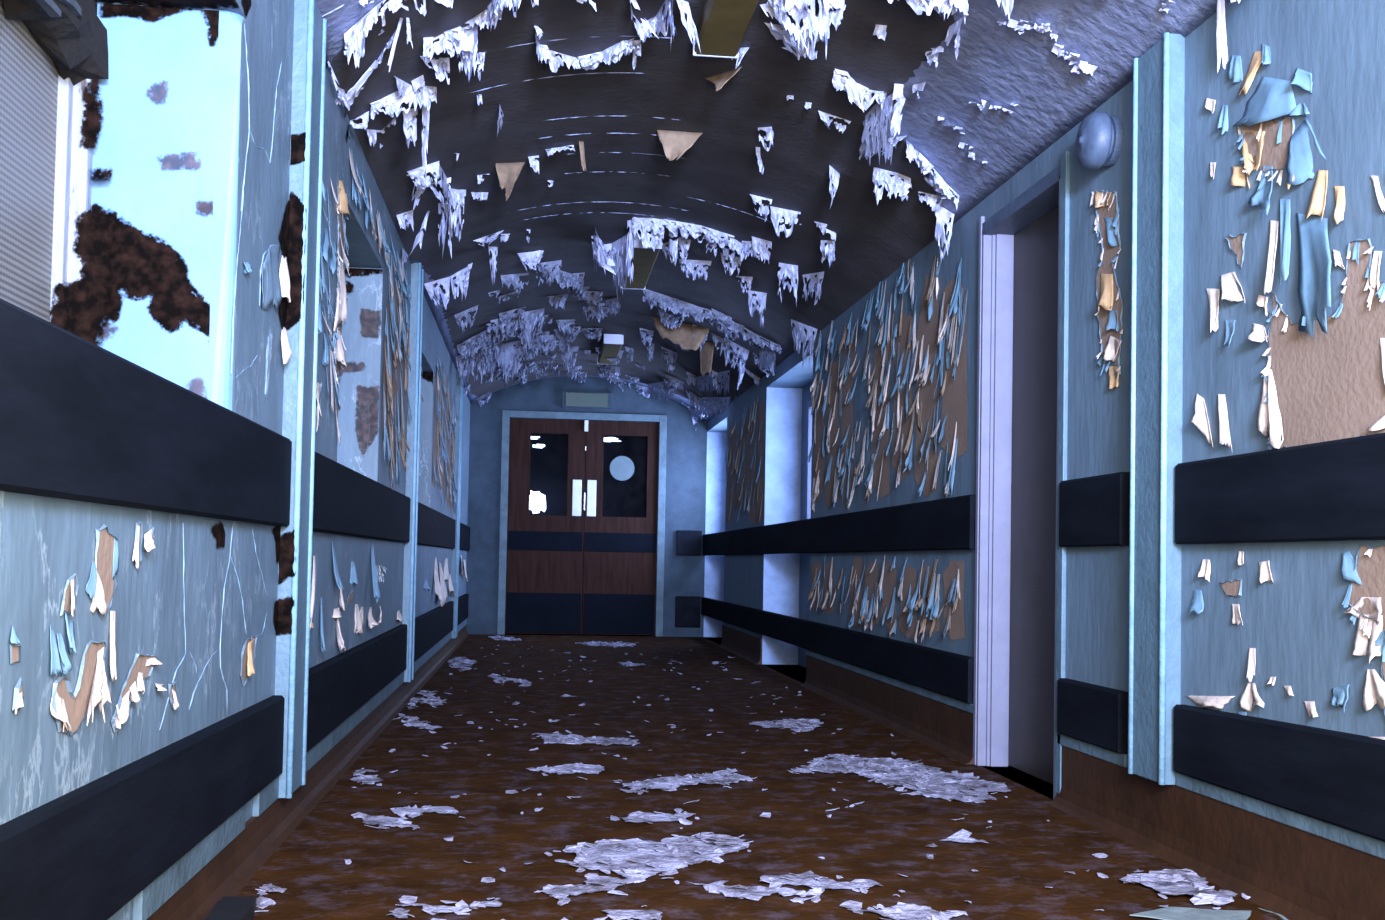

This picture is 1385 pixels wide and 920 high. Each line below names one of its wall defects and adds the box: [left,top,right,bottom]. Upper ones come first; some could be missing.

peeling [279,0,968,524]
peeling [1090,189,1123,389]
peeling [1190,394,1232,450]
peeling [10,625,24,715]
peeling [50,521,179,736]
peeling [240,636,257,688]
peeling [273,526,404,654]
peeling [807,555,965,644]
peeling [1186,544,1385,718]